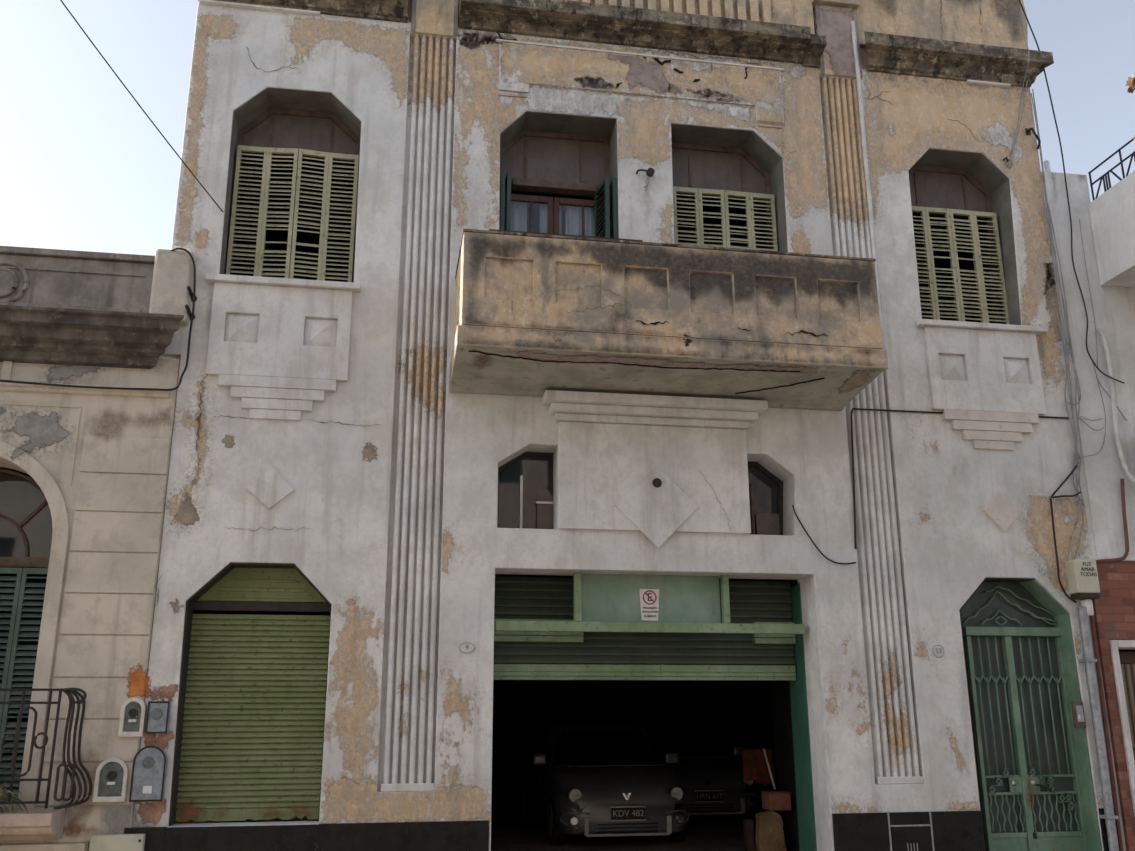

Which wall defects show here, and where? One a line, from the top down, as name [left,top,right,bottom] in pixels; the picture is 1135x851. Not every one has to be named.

peeling [175,15,239,249]
peeling [289,8,1065,385]
crack [550,285,669,325]
crack [469,350,825,394]
crack [786,329,827,337]
flaking render [164,381,209,527]
flaking render [222,435,235,448]
peeling [1023,495,1088,592]
rust [126,665,151,698]
peeling [320,596,490,824]
peeling [881,651,910,756]
peeling [950,801,981,811]